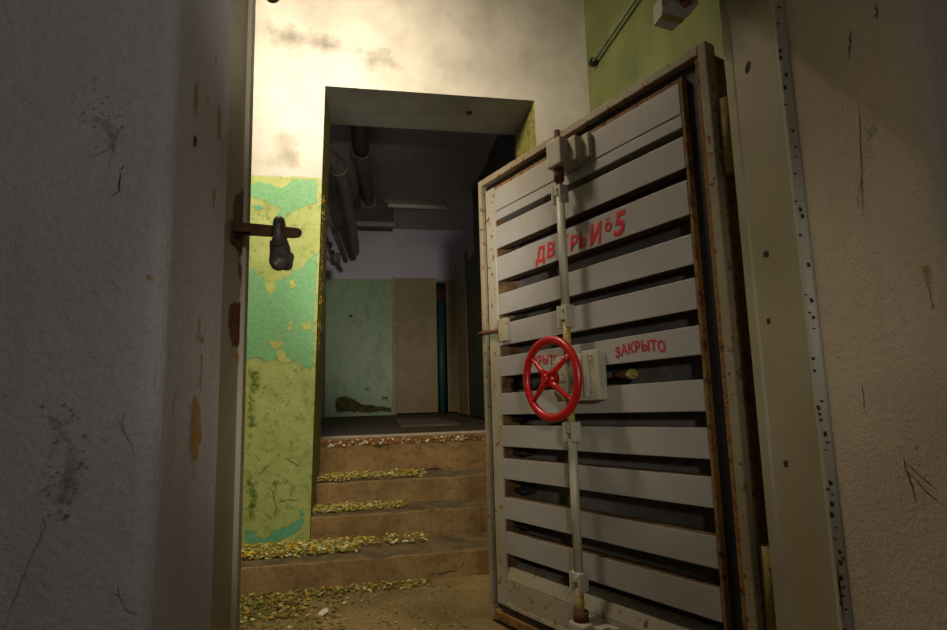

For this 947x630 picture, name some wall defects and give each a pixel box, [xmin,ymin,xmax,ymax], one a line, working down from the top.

crack [88,130,124,196]
corrosion [234,182,251,222]
corrosion [229,248,249,360]
peeling [246,179,325,370]